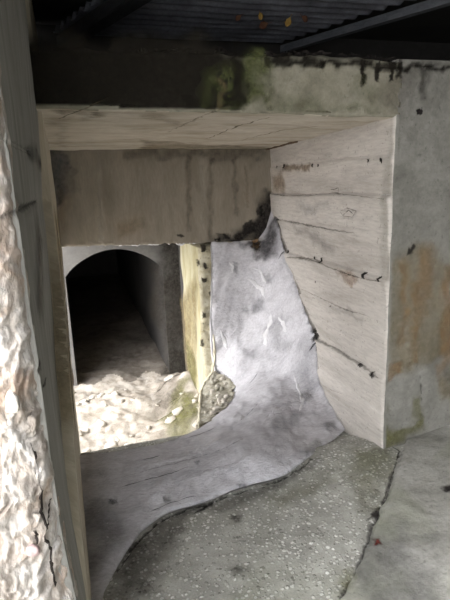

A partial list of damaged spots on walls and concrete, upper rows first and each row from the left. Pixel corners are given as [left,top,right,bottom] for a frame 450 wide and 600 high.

leakage [29,28,248,110]
leakage [265,53,450,85]
spalling [196,329,236,430]
crack [340,447,400,599]